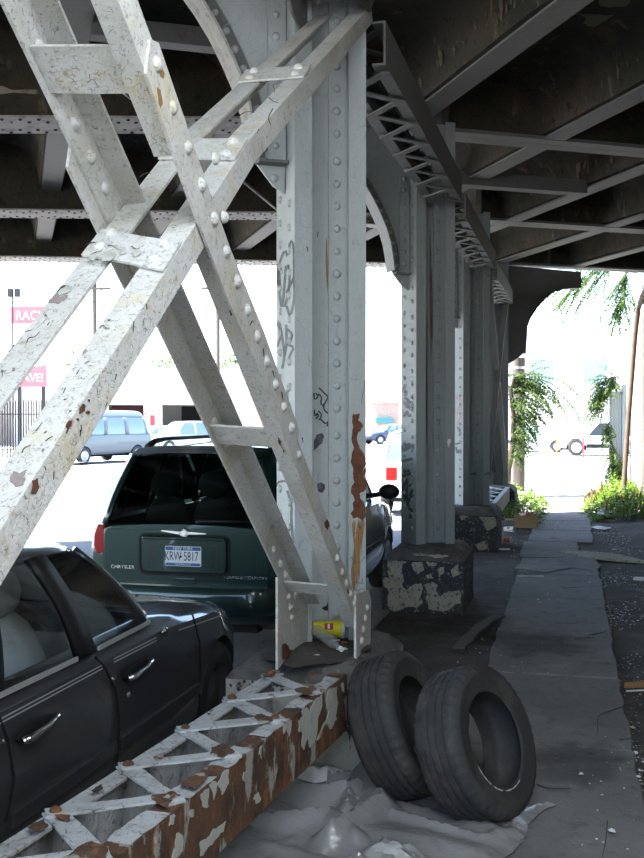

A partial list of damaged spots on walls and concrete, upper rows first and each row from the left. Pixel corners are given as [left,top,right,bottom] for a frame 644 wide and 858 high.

corrosion [347,414,367,593]
peeling [479,517,496,530]
peeling [383,554,461,612]
corrosion [254,713,273,723]
peeling [283,683,344,751]
corrosion [210,743,230,758]
corrosion [151,767,210,808]
peeling [189,769,229,818]
corrosion [27,814,71,832]
corrosion [64,841,108,858]
peeling [169,814,184,858]
peeling [200,821,226,856]